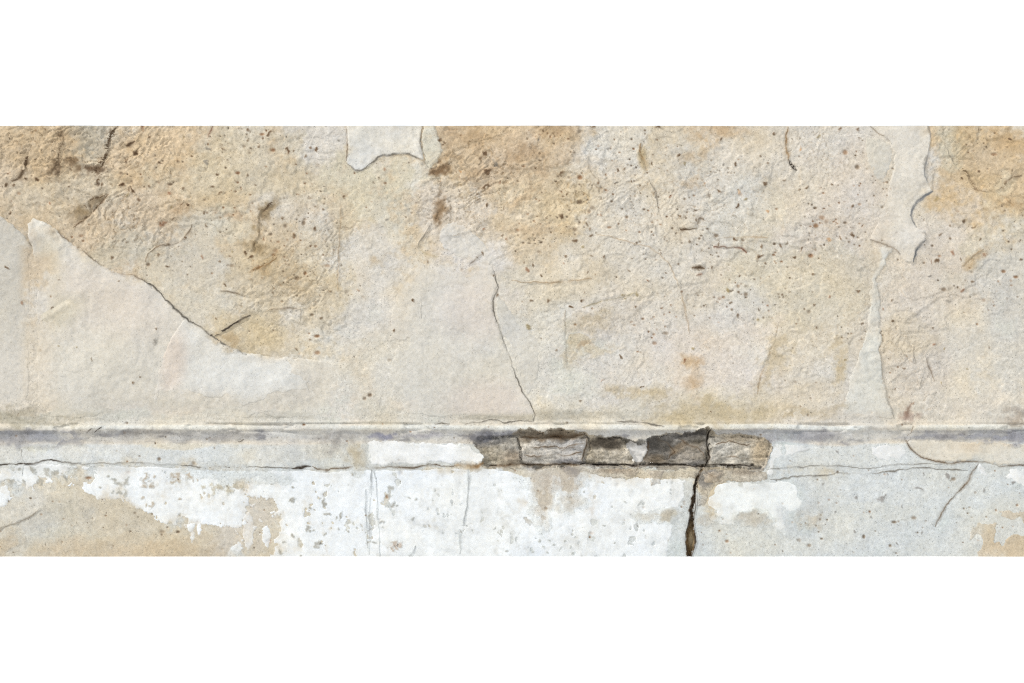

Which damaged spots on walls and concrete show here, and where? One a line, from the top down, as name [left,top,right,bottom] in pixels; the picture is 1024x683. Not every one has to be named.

spalling [118,181,151,202]
spalling [158,186,190,230]
spalling [157,145,226,196]
flaking render [337,126,447,172]
spalling [475,149,502,208]
flaking render [842,126,988,419]
crack [434,253,636,426]
peeling [0,218,810,557]
crack [0,427,485,475]
crack [768,345,1024,527]
crack [683,466,722,557]